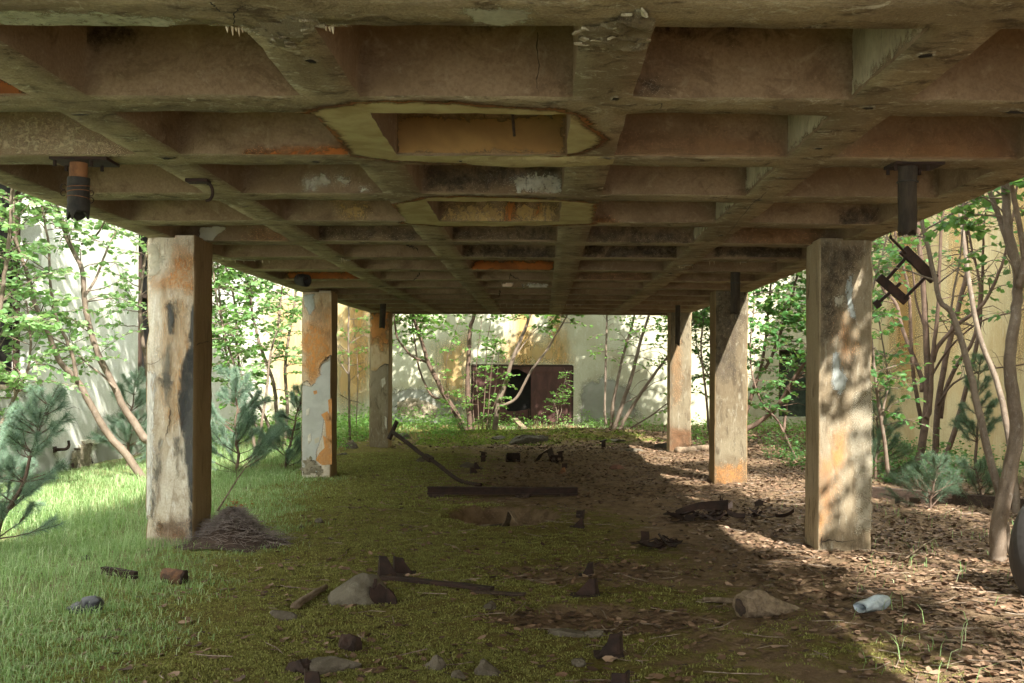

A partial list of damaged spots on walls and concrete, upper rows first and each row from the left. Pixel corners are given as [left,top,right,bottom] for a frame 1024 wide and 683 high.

water stain [301,100,734,258]
water stain [95,304,194,543]
spalling [299,293,332,477]